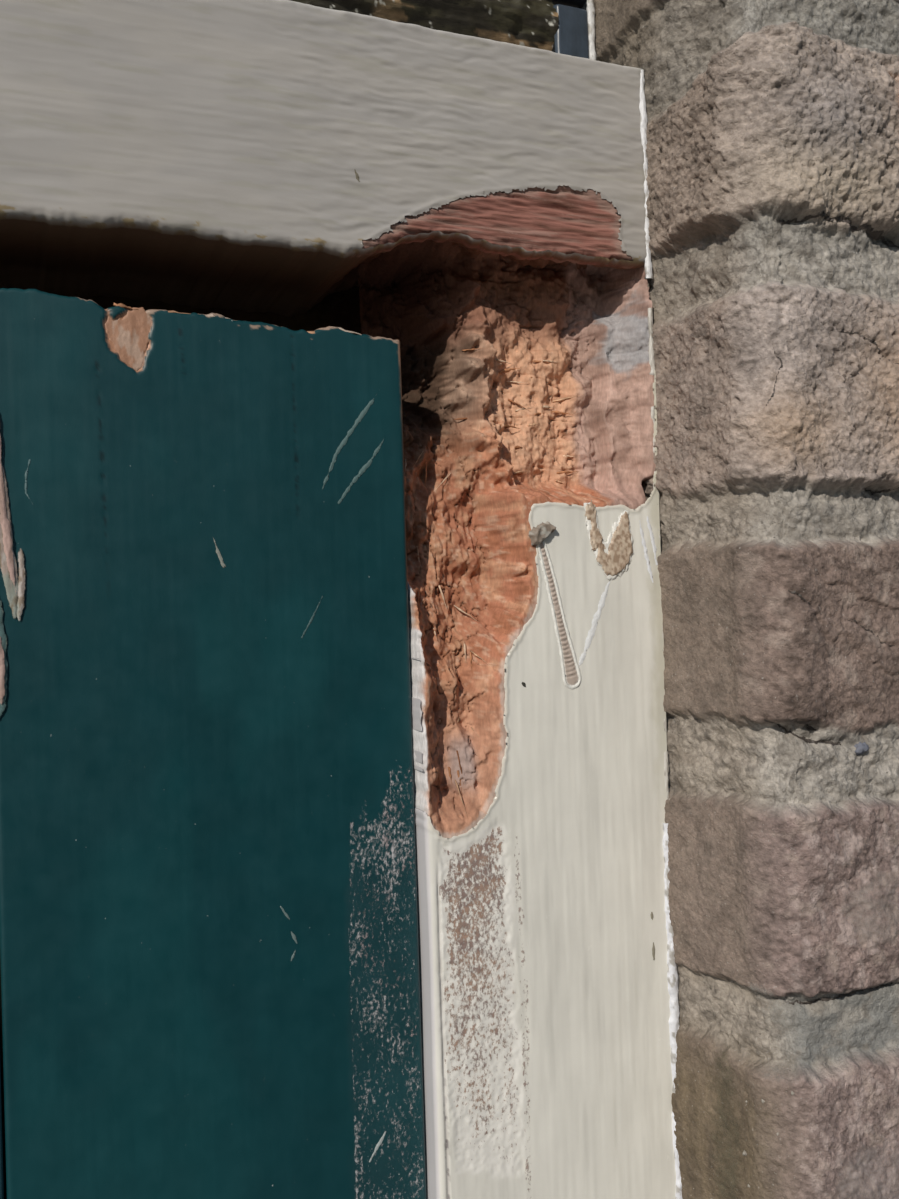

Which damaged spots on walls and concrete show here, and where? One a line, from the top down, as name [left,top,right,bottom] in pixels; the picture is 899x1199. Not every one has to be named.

spalling [105,303,151,371]
crack [774,211,899,248]
peeling [0,436,25,716]
spalling [331,185,656,1199]